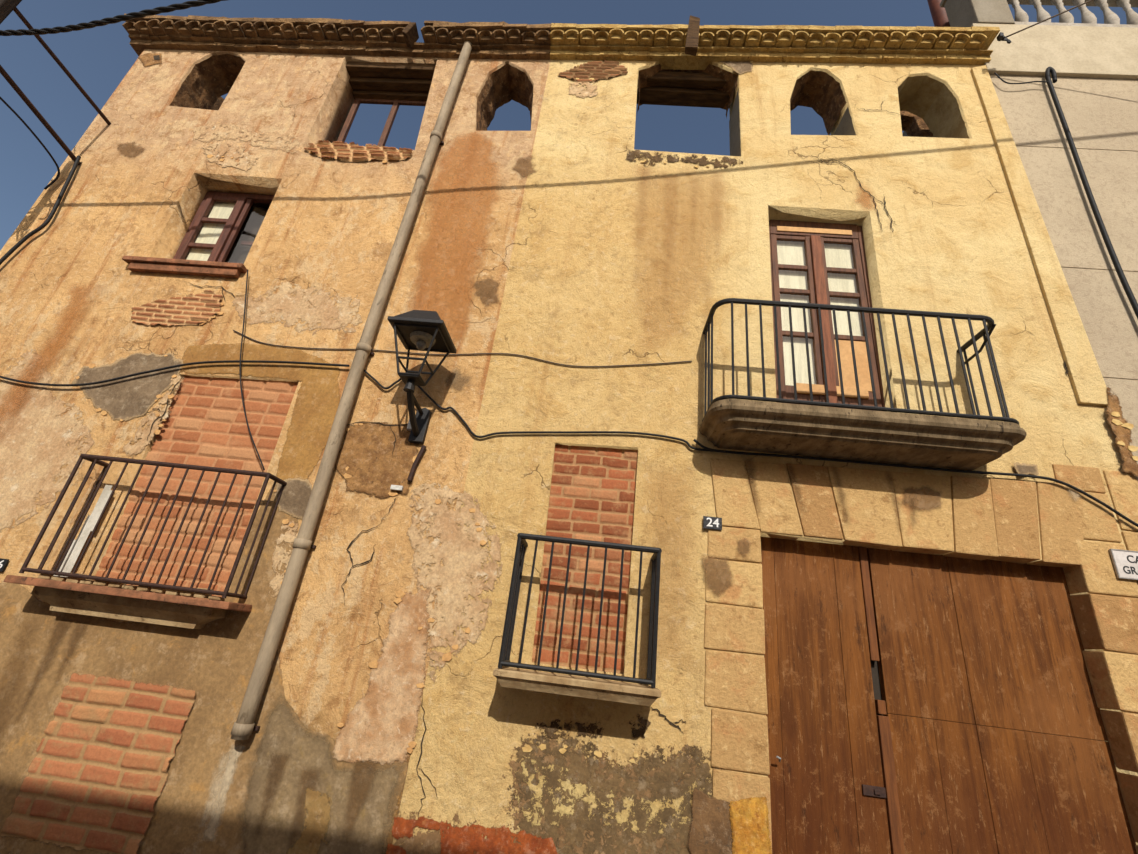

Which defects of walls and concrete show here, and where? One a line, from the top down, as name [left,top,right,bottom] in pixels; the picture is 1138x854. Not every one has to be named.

flaking render [558,60,628,98]
crack [811,155,895,232]
flaking render [0,349,184,530]
flaking render [1106,385,1138,477]
crack [341,498,396,604]
peeling [332,422,503,765]
water stain [903,487,941,510]
water stain [203,747,242,839]
water stain [240,703,399,854]
crack [416,696,438,818]
peeling [386,733,723,854]